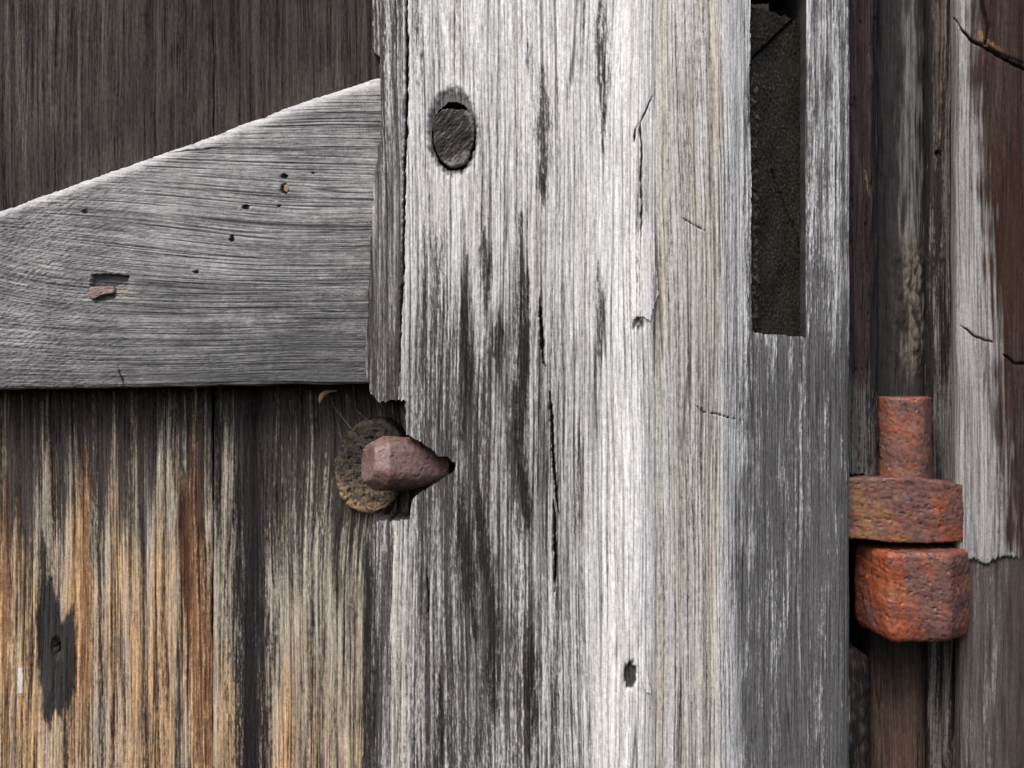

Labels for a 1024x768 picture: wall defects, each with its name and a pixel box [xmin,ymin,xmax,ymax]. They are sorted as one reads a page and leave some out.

crack [960,0,1024,71]
crack [634,103,649,237]
crack [538,301,546,364]
crack [550,393,559,583]
water stain [35,531,78,768]
water stain [114,567,130,768]